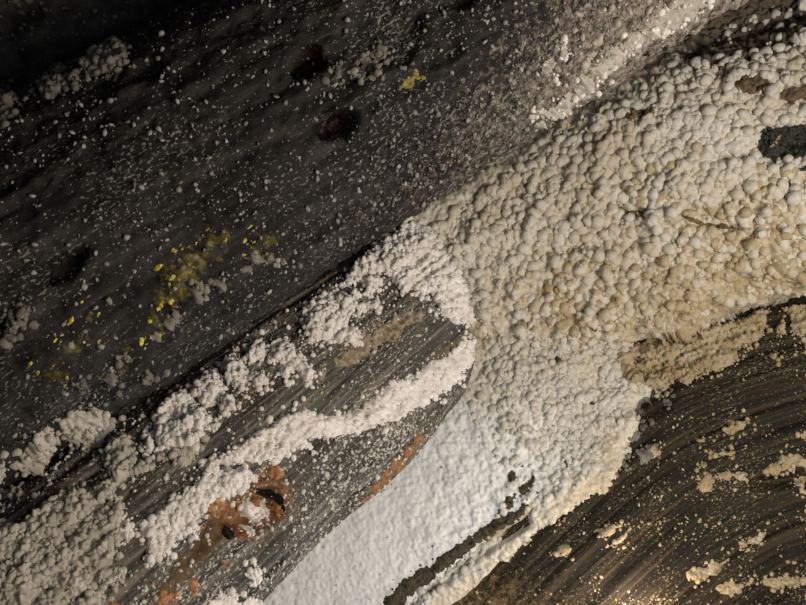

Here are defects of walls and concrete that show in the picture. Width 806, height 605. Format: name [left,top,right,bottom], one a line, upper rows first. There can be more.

water stain [398,71,426,89]
water stain [530,0,715,136]
spalling [753,124,806,171]
water stain [615,264,806,478]
water stain [0,219,477,605]
rust [199,465,291,540]
rust [362,425,424,503]
water stain [549,544,575,561]
water stain [594,516,632,554]
water stain [686,557,806,598]
water stain [691,408,806,522]
water stain [738,529,766,553]